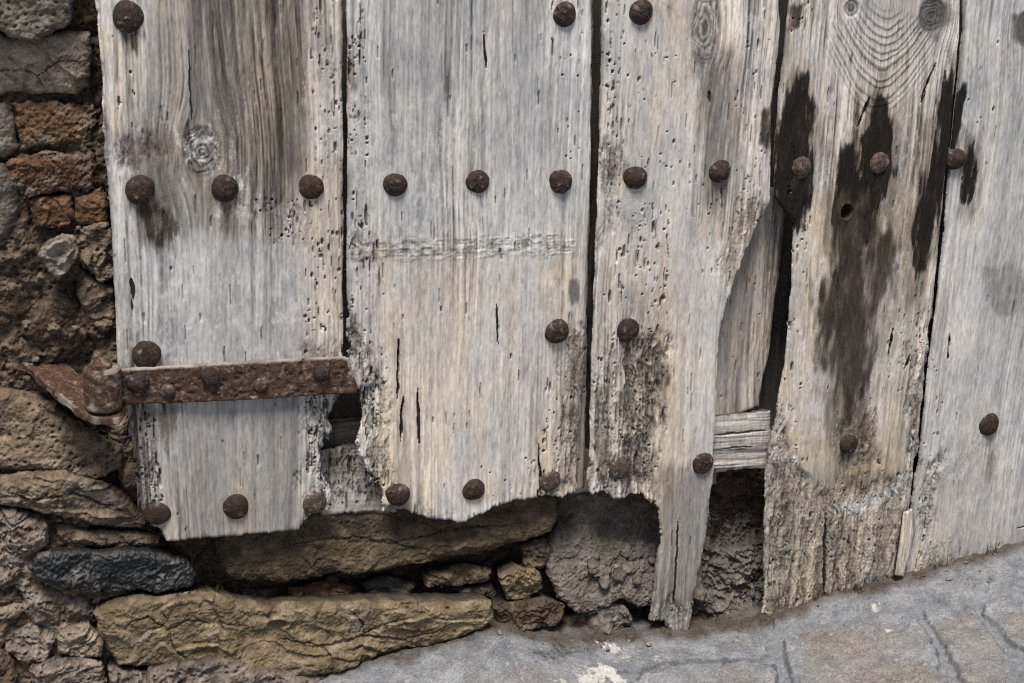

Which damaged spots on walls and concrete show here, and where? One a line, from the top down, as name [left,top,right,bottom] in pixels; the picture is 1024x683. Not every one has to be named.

crack [920,64,935,102]
leakage [760,109,771,148]
leakage [950,82,967,149]
leakage [787,195,806,233]
leakage [809,125,896,437]